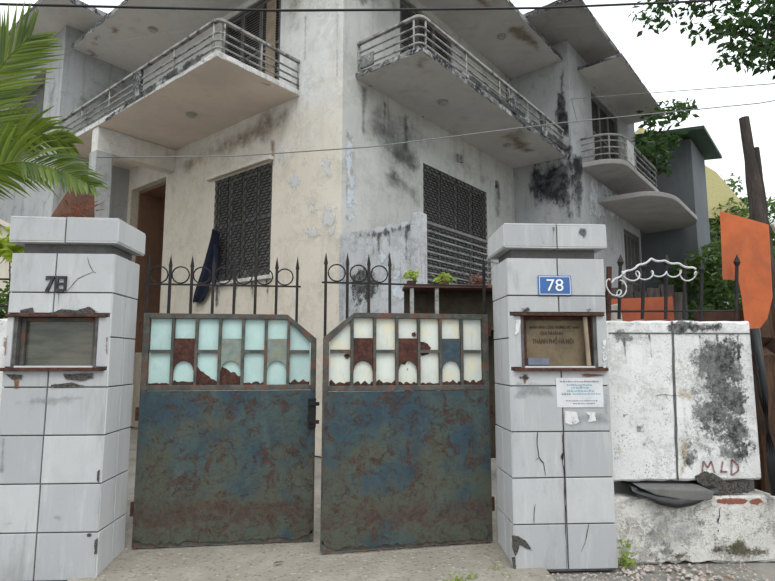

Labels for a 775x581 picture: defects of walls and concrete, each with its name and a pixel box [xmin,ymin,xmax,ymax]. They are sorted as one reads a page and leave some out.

water stain [555,74,569,136]
water stain [377,120,414,167]
water stain [530,142,584,217]
water stain [349,268,378,307]
water stain [668,320,756,466]
crack [535,424,589,571]
spalling [511,534,532,569]